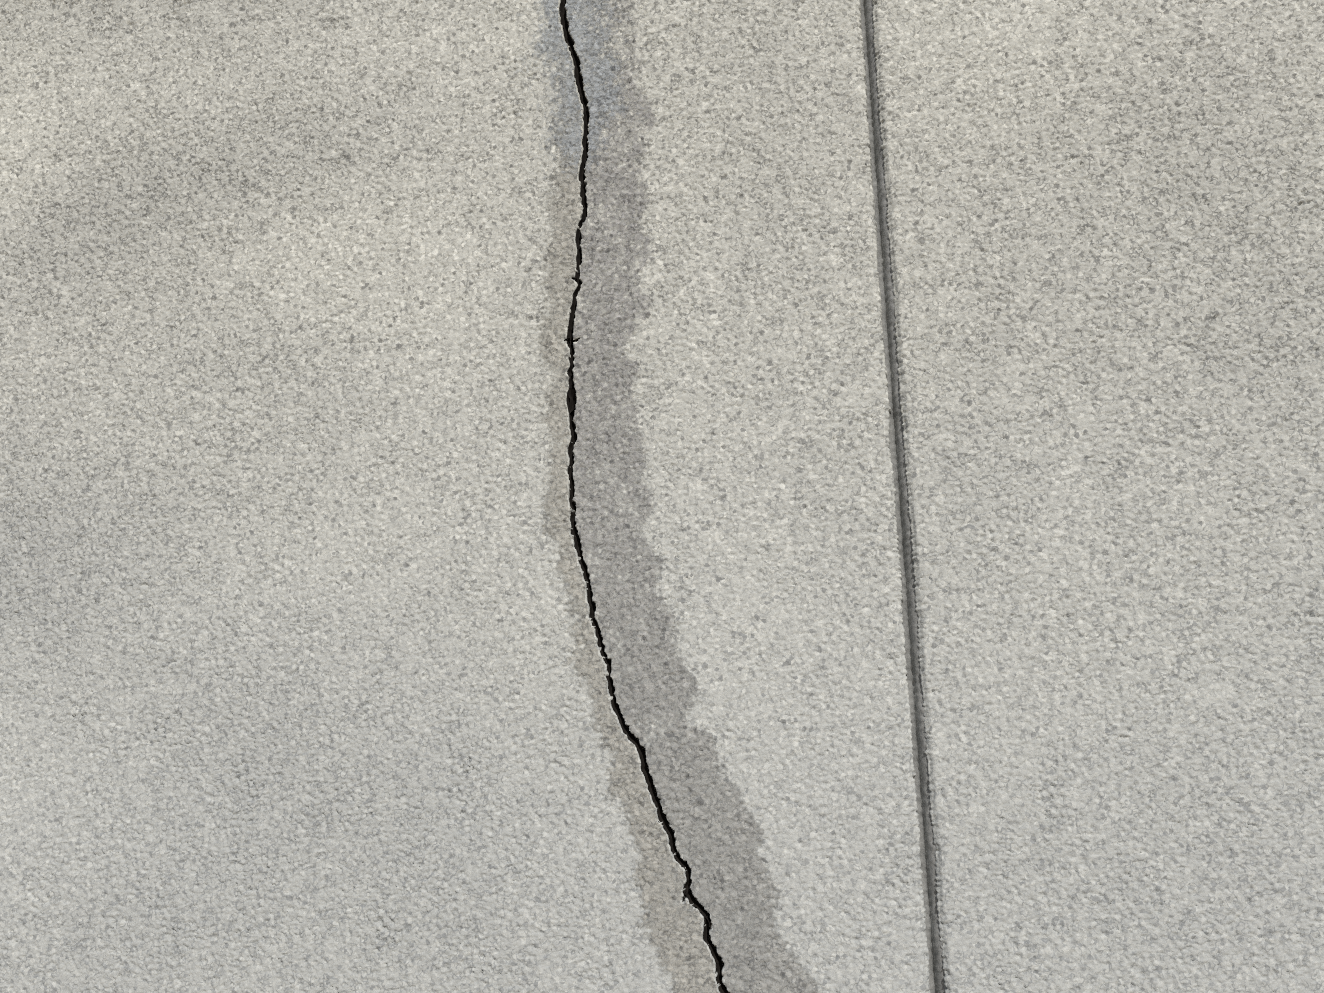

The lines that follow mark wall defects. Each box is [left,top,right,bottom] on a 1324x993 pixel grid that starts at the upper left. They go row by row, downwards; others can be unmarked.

crack [559,0,729,993]
damp [536,0,818,993]